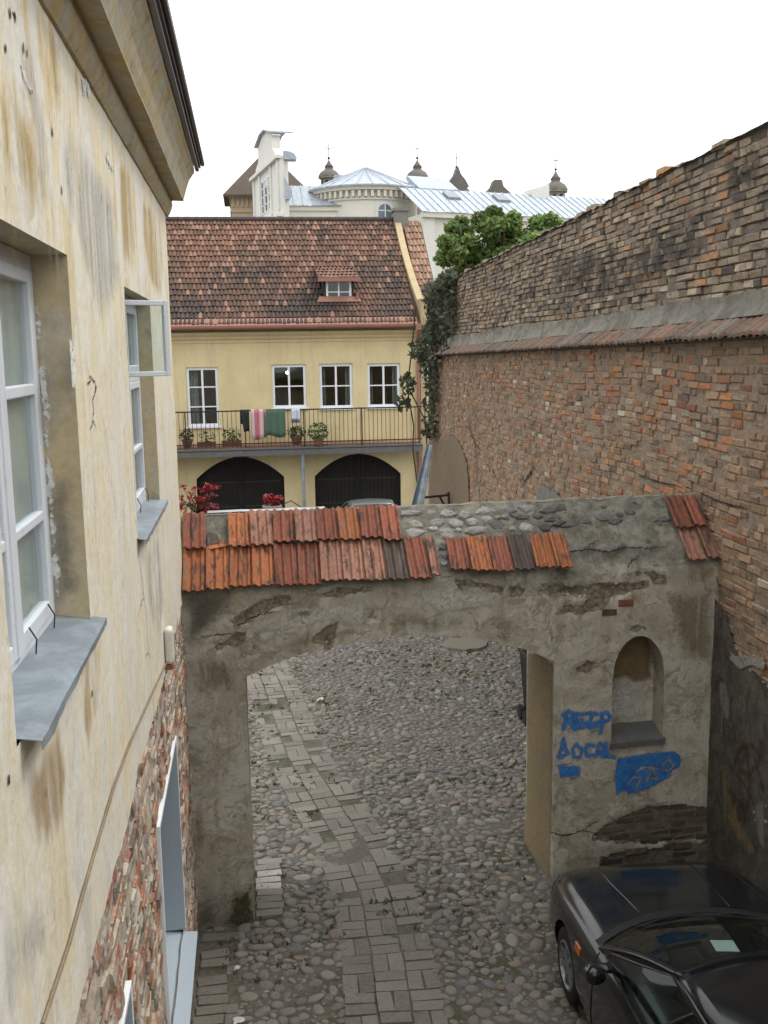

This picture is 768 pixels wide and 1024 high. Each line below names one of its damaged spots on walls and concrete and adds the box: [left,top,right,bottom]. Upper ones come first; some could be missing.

leakage [68,153,132,304]
peeling [35,306,61,595]
crack [563,540,667,572]
spalling [538,570,667,617]
spalling [215,594,311,650]
crack [551,821,597,836]